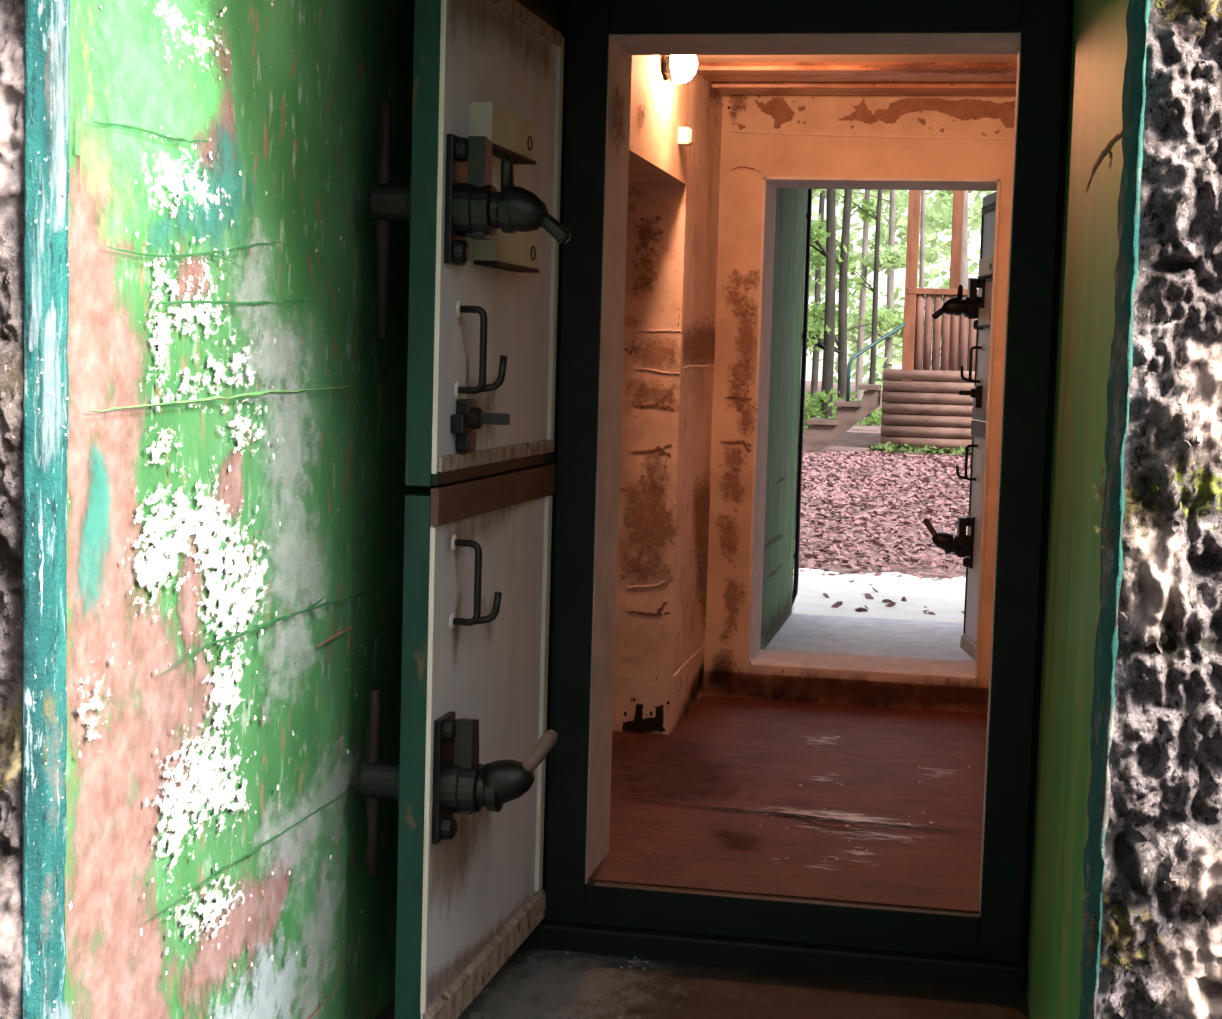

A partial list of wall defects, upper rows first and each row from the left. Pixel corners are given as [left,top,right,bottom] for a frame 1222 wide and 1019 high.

peeling [737,95,814,134]
peeling [839,95,1015,137]
peeling [29,0,305,1019]
water stain [677,566,988,725]